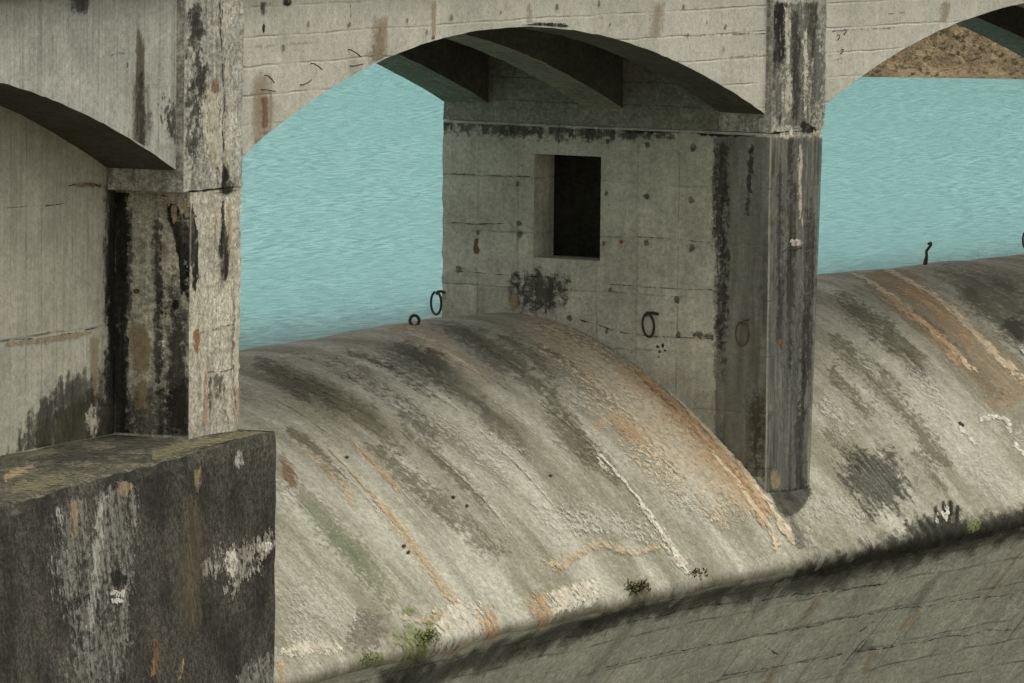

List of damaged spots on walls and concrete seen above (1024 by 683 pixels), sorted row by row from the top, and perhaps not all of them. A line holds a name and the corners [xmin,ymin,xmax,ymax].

rust [254,81,273,143]
water stain [91,186,134,434]
water stain [151,203,208,429]
water stain [216,1,1024,683]
rust [518,314,796,549]
rust [848,269,1024,415]